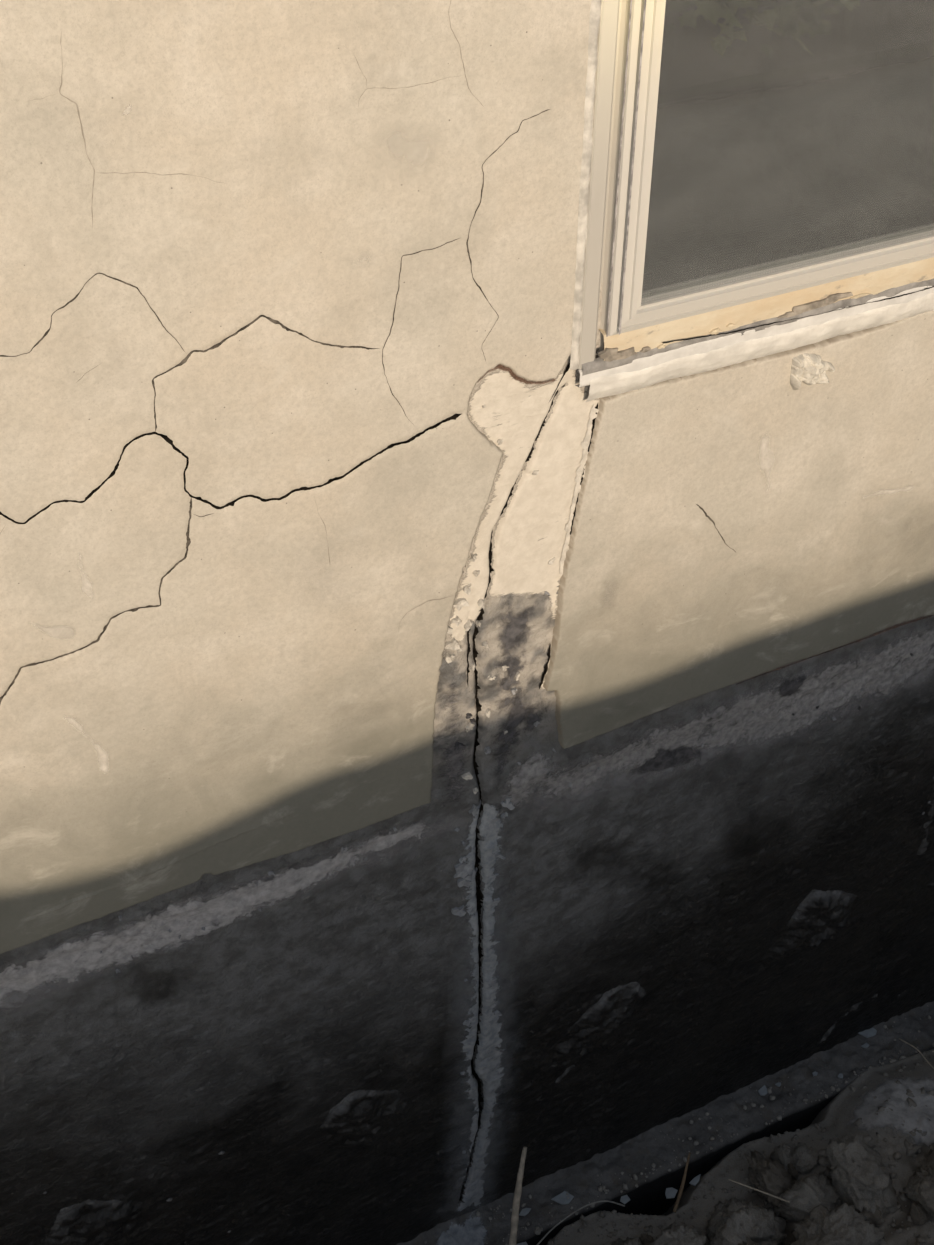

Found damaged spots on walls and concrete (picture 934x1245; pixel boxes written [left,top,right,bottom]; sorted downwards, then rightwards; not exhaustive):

crack [27,31,227,227]
crack [354,1,484,107]
crack [0,109,551,704]
spalling [442,358,599,803]
crack [559,404,599,577]
crack [695,503,735,551]
crack [399,362,570,1203]
damp [0,823,439,1008]
damp [436,629,934,1245]